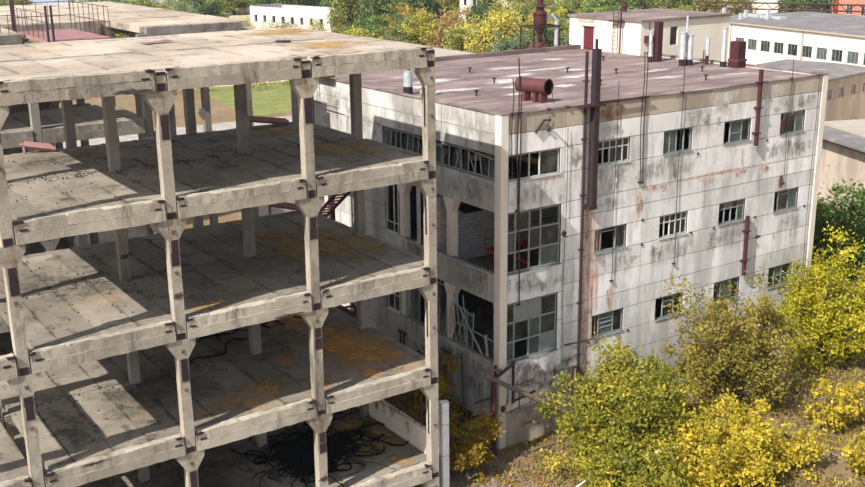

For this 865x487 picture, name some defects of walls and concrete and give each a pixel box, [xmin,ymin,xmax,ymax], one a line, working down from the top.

corrosion [581,211,612,362]